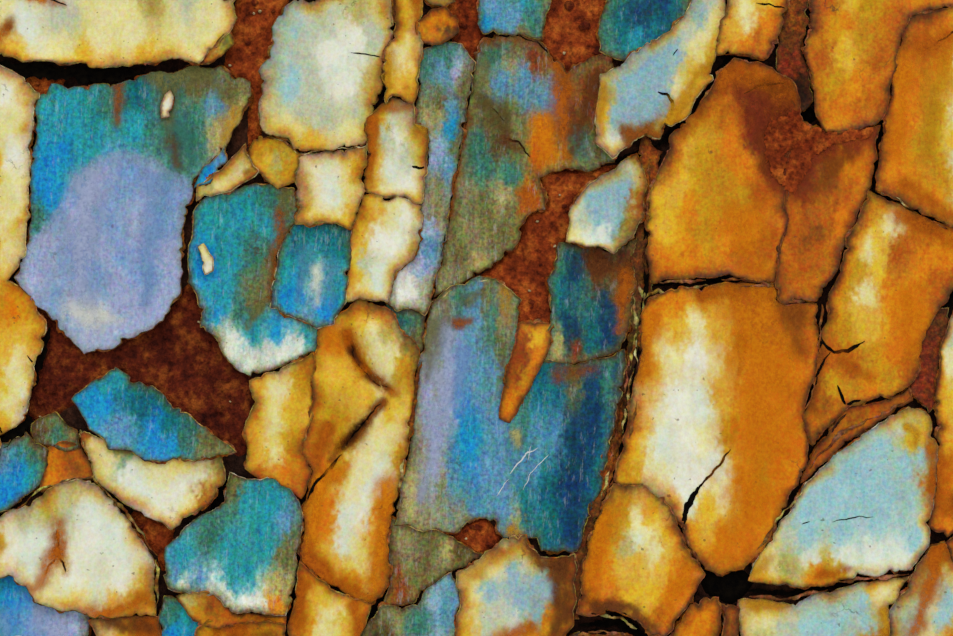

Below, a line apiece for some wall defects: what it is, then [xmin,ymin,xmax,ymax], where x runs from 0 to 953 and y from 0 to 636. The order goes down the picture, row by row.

rust [148,66,223,95]
rust [221,0,289,147]
rust [478,0,617,322]
rust [761,56,912,198]
rust [27,284,255,457]
peeling [0,0,422,636]
rust [452,318,472,329]
peeling [346,0,953,636]
crack [605,220,760,497]
crack [805,337,865,411]
crack [681,449,731,534]
crack [580,556,703,636]